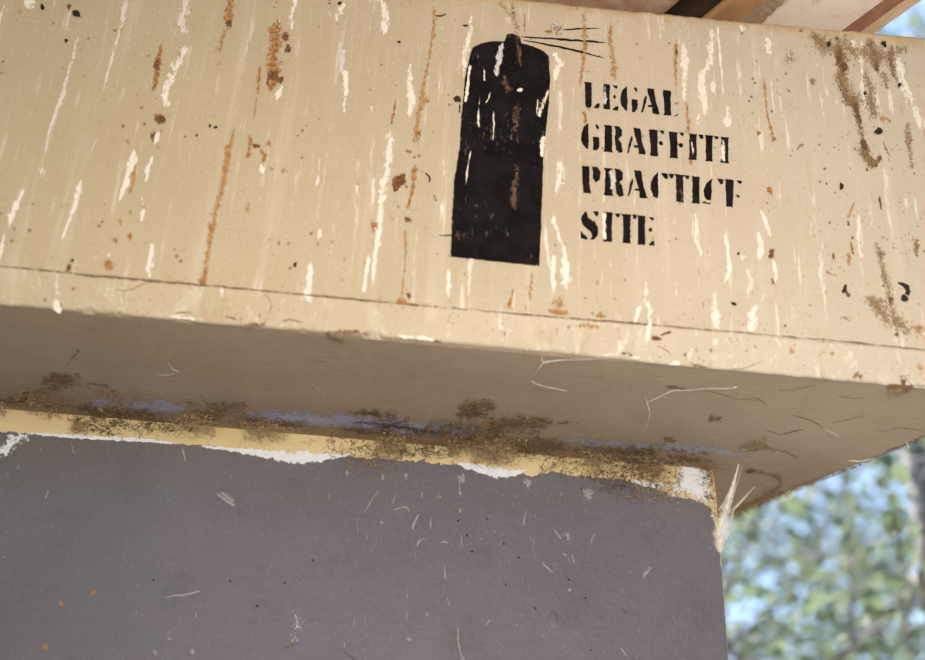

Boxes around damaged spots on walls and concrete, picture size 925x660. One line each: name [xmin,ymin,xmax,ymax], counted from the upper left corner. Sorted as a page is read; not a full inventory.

corrosion [152,43,163,92]
corrosion [215,0,235,65]
corrosion [253,19,283,117]
leakage [819,38,923,169]
corrosion [246,136,287,174]
corrosion [388,7,446,304]
corrosion [197,129,235,285]